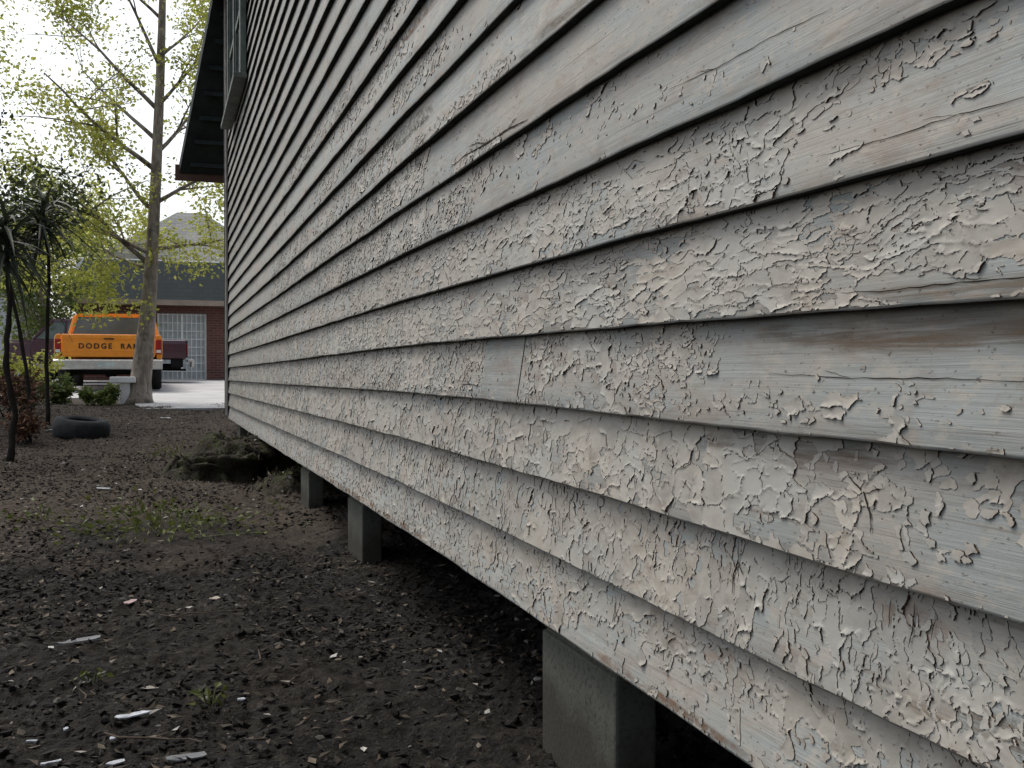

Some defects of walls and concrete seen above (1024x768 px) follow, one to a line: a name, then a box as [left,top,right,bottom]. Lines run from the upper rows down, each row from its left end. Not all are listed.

peeling [228,0,1024,768]